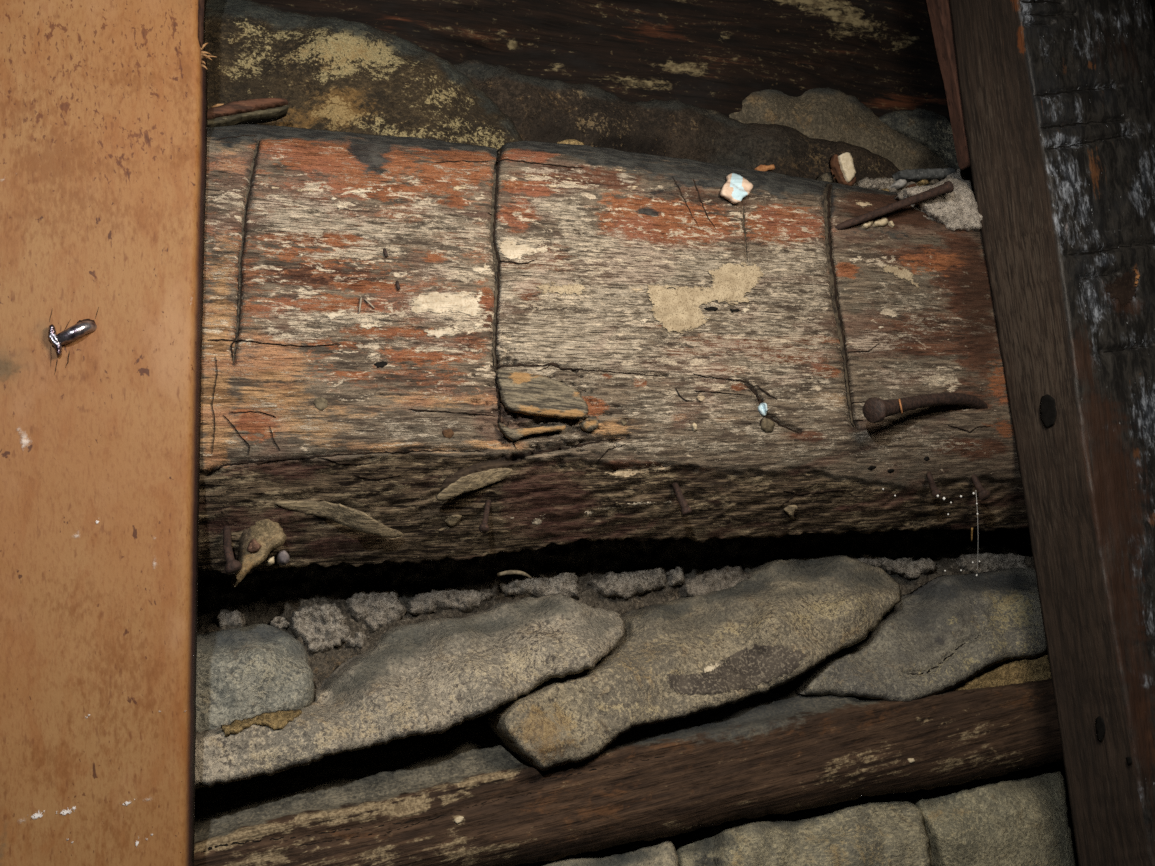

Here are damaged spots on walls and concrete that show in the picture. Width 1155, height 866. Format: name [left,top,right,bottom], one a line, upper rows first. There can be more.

peeling [829,152,856,186]
peeling [330,187,379,210]
peeling [719,173,753,204]
peeling [497,239,548,260]
peeling [632,262,764,334]
peeling [408,291,486,339]
peeling [605,464,671,478]